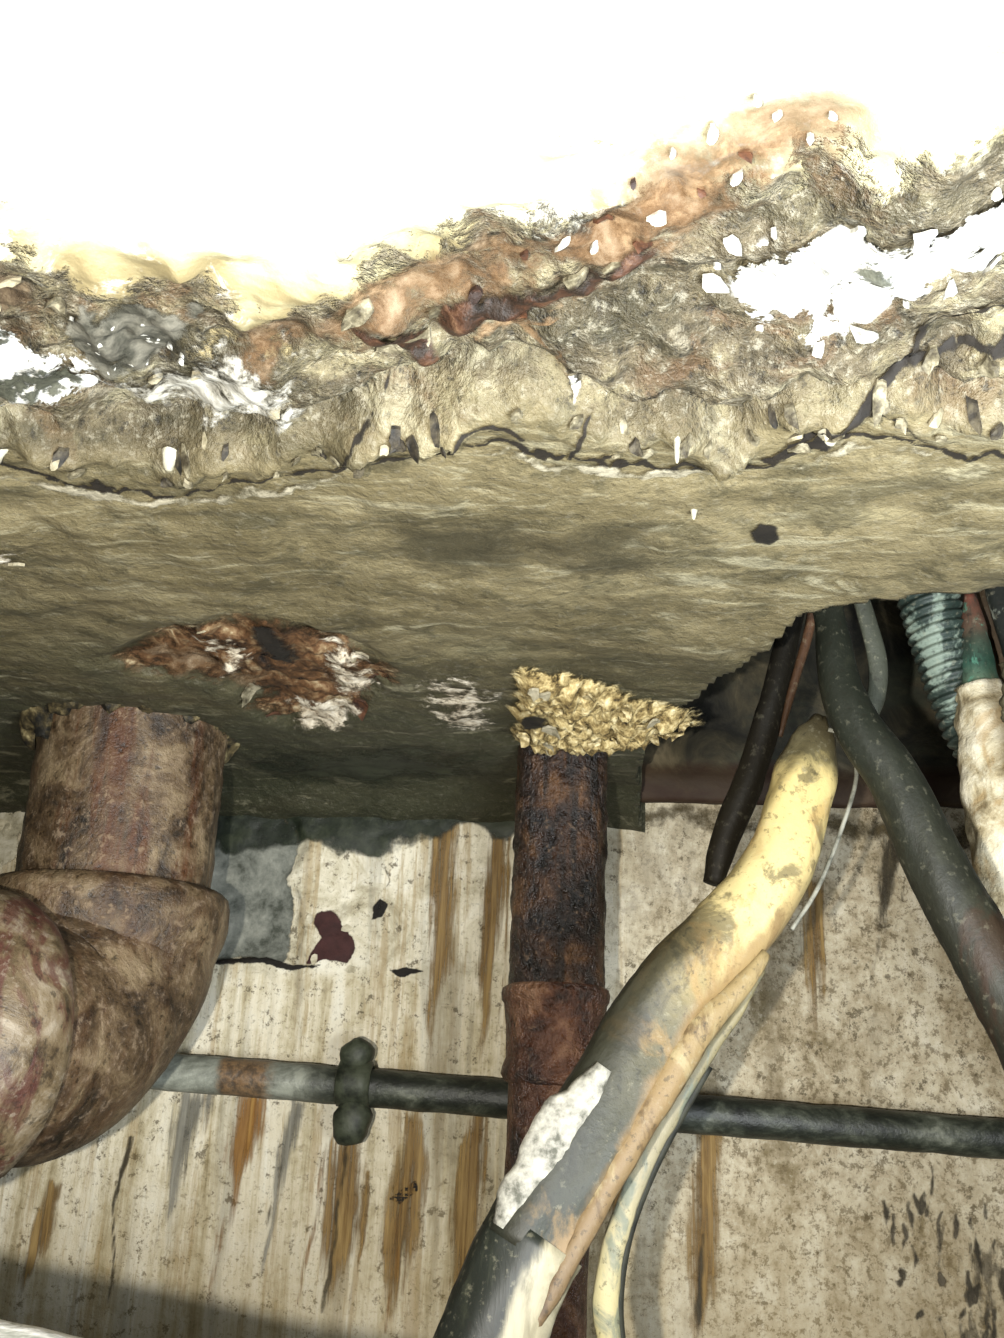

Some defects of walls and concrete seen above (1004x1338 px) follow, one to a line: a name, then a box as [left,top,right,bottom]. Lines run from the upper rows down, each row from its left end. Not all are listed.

peeling [0,264,108,406]
water stain [66,302,300,430]
spalling [341,237,657,367]
rust [241,95,855,380]
spalling [568,376,581,401]
peeling [702,187,1004,358]
spalling [111,613,399,731]
rust [230,1097,266,1207]
water stain [882,1170,1004,1338]